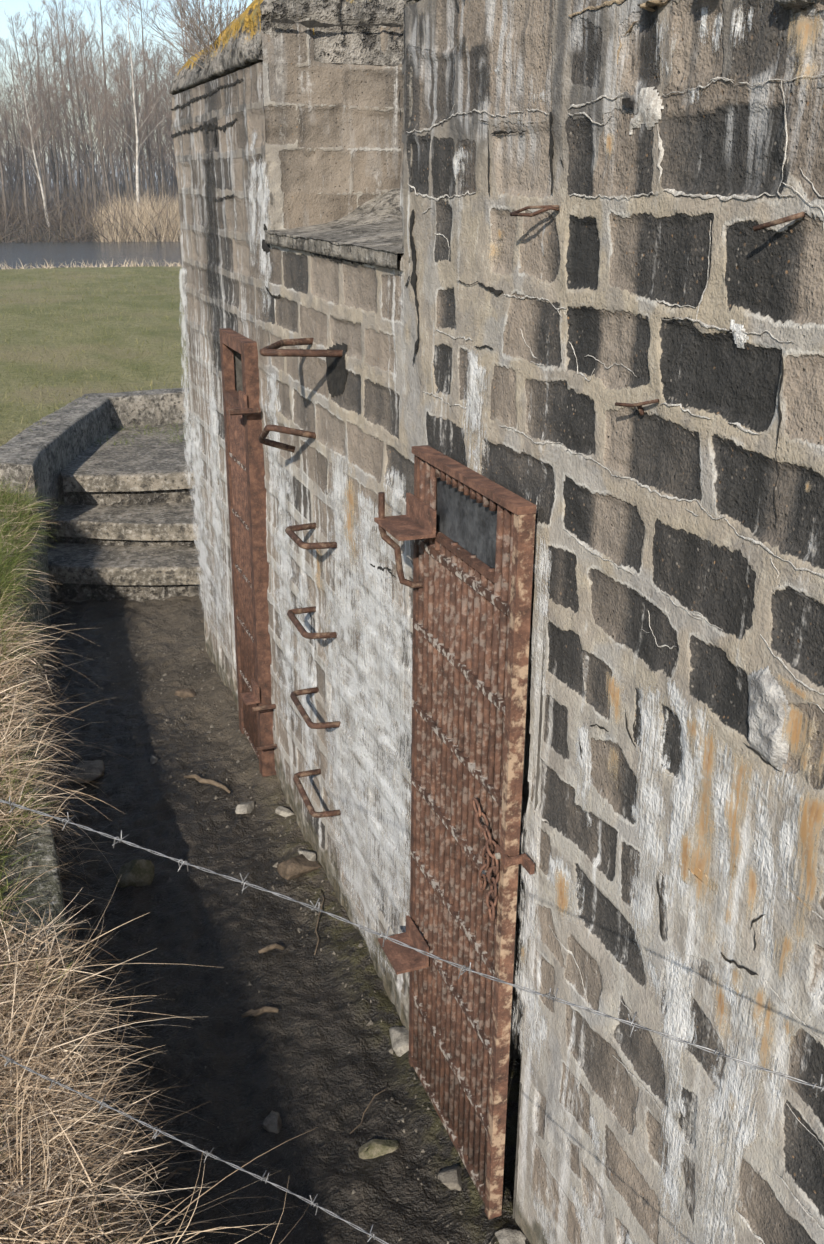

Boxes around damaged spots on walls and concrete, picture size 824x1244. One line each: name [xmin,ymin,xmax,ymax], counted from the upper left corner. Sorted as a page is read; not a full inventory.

crack [568,0,669,64]
water stain [632,24,676,77]
water stain [700,8,753,51]
crack [398,74,824,582]
corrosion [679,719,757,922]
corrosion [555,871,569,912]
crack [638,854,663,940]
corrosion [774,791,824,977]
corrosion [715,969,738,1035]
corrosion [753,990,792,1072]